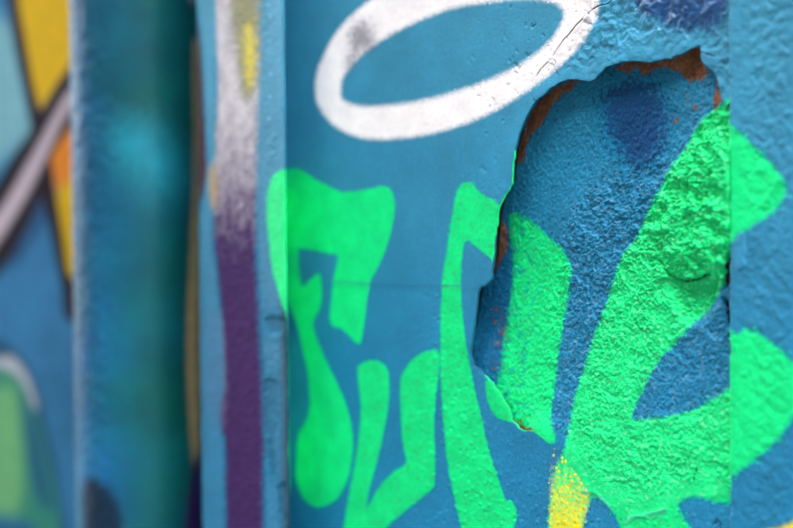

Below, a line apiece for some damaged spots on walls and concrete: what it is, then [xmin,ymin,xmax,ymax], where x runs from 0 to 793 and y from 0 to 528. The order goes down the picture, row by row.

crack [536,0,612,77]
flaking render [470,46,748,515]